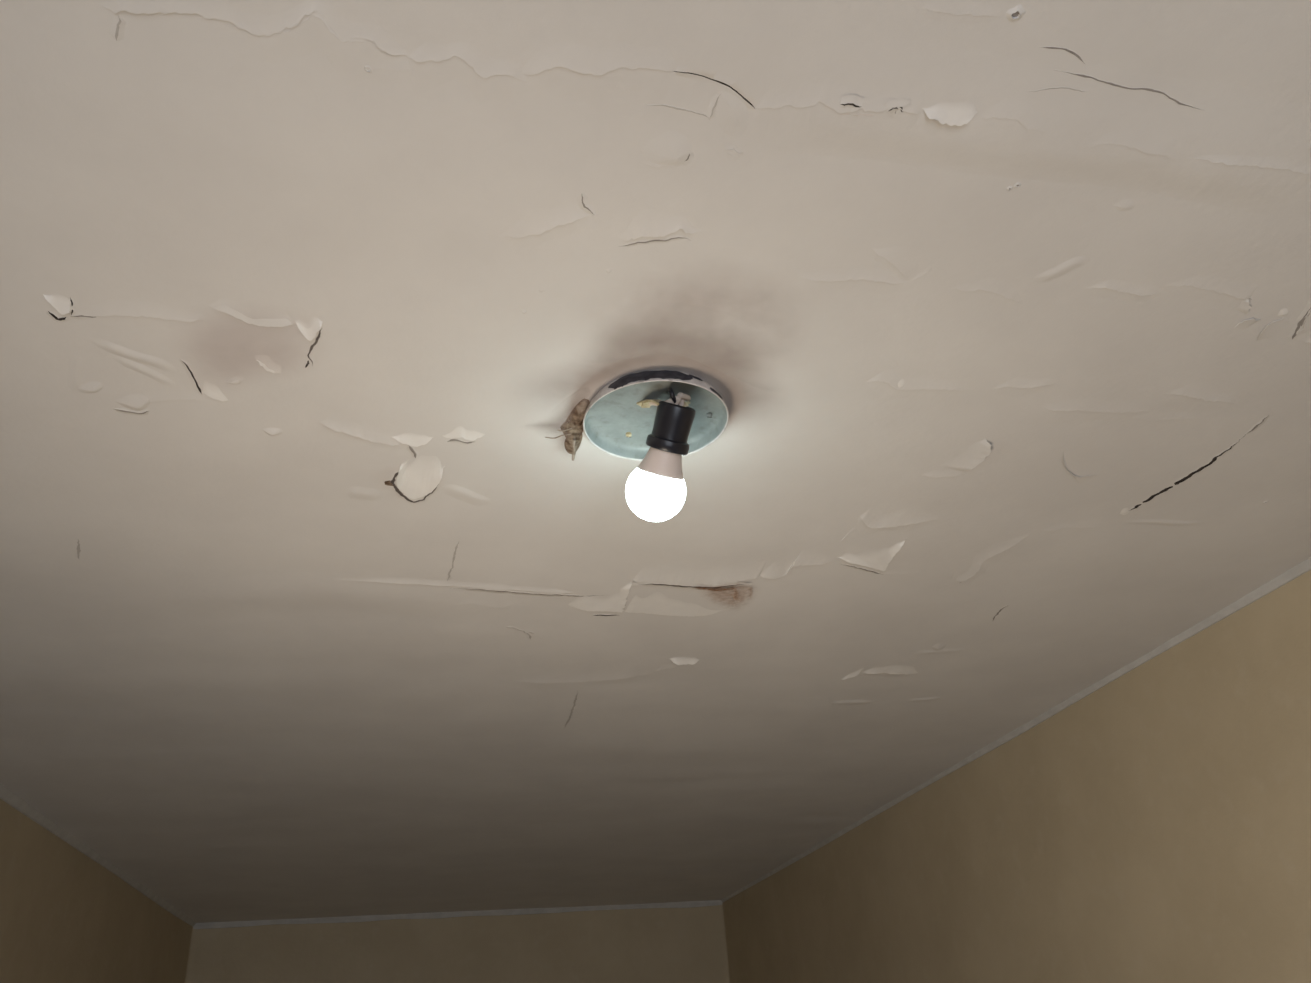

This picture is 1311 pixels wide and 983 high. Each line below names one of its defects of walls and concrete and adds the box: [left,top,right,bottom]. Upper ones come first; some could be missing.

peeling [617,209,702,247]
peeling [207,298,325,373]
crack [1288,300,1311,339]
peeling [319,417,491,506]
crack [1120,414,1270,515]
peeling [327,539,922,617]